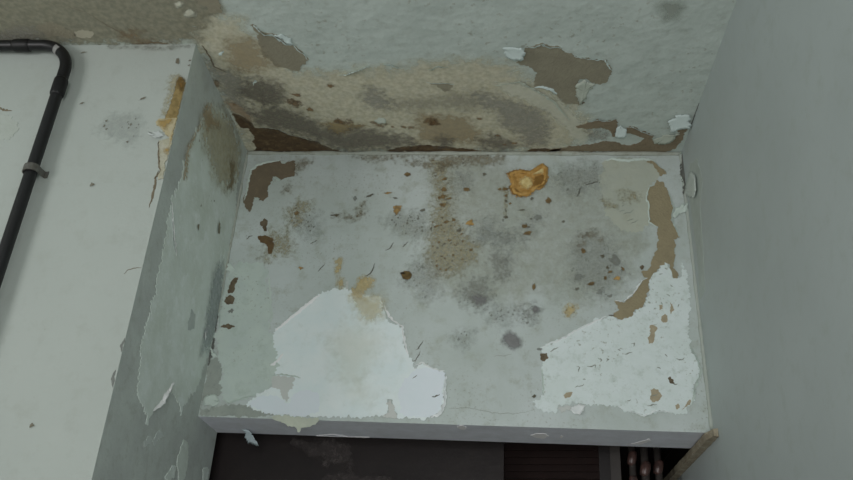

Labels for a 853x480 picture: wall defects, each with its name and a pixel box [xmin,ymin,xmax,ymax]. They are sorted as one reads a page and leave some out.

peeling [251,24,309,72]
peeling [503,43,613,105]
spalling [148,77,186,207]
water stain [0,0,590,286]
peeling [137,102,447,432]
water stain [572,231,625,297]
peeling [528,114,705,417]
peeling [165,440,189,480]